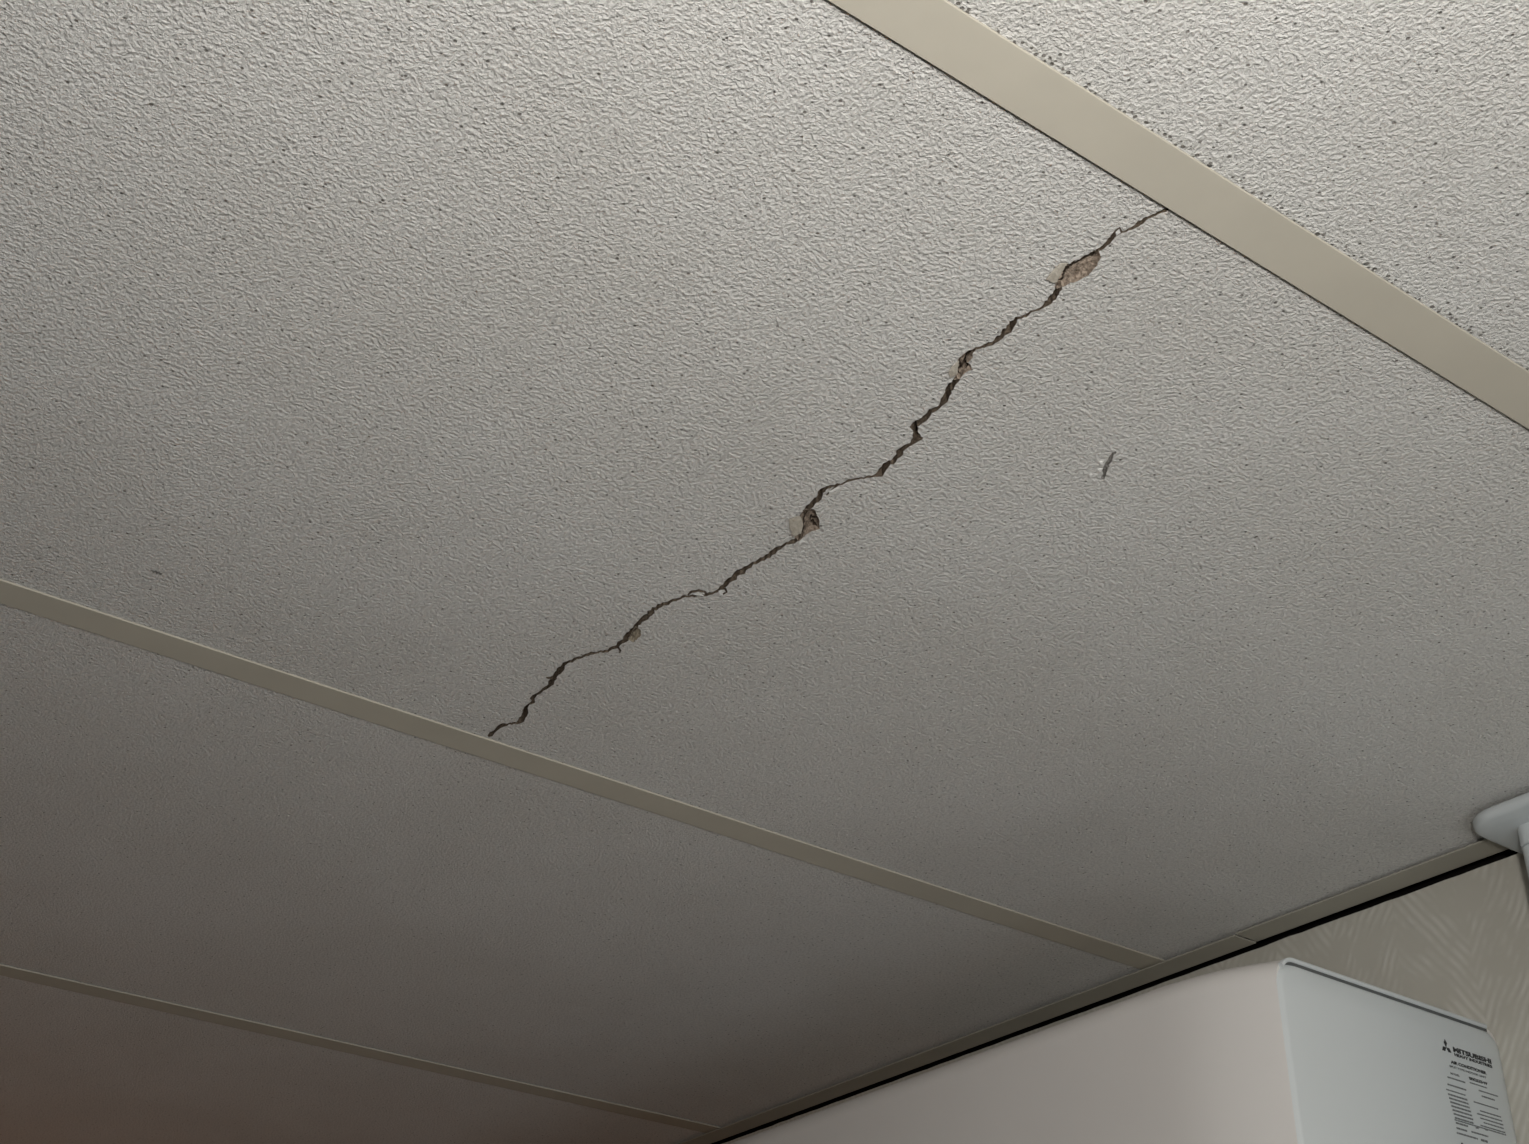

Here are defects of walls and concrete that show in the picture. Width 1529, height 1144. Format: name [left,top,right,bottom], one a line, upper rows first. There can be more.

crack [1094,208,1168,254]
crack [488,281,1062,737]